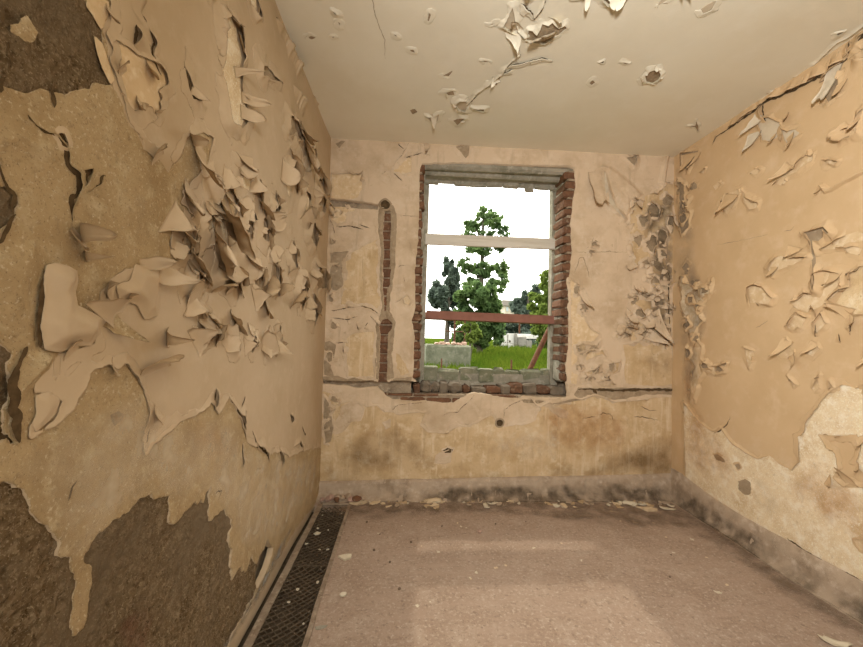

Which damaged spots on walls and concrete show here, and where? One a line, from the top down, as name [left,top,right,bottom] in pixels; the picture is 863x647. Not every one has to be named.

peeling [484,0,570,55]
peeling [578,0,626,13]
peeling [637,64,666,86]
crack [711,22,863,146]
peeling [811,56,848,109]
peeling [739,104,863,186]
peeling [0,0,324,420]
peeling [0,171,700,647]
peeling [677,257,863,581]
damp [443,487,580,502]
damp [605,487,660,502]
peeling [817,634,853,647]